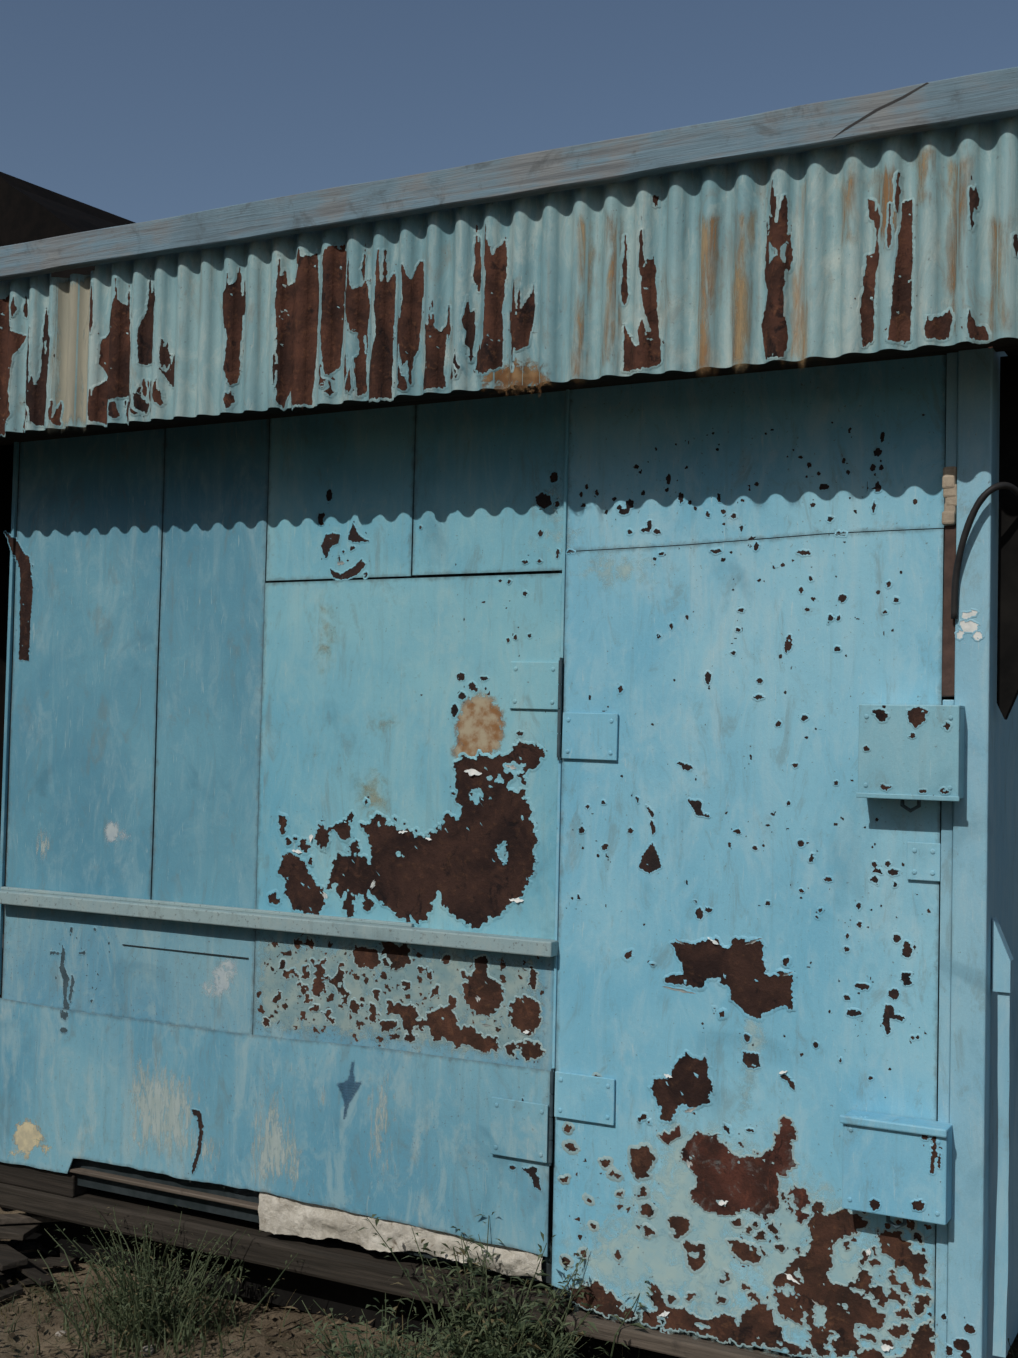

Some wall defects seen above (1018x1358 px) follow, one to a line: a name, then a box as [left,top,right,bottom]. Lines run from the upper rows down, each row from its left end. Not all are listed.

rust [879,170,896,239]
rust [950,165,964,312]
rust [605,234,620,347]
rust [698,218,717,368]
rust [733,271,745,361]
rust [55,277,91,425]
rust [481,359,550,392]
rust [453,694,504,758]
rust [919,1134,943,1182]
rust [867,1196,884,1213]
rust [910,1195,929,1216]